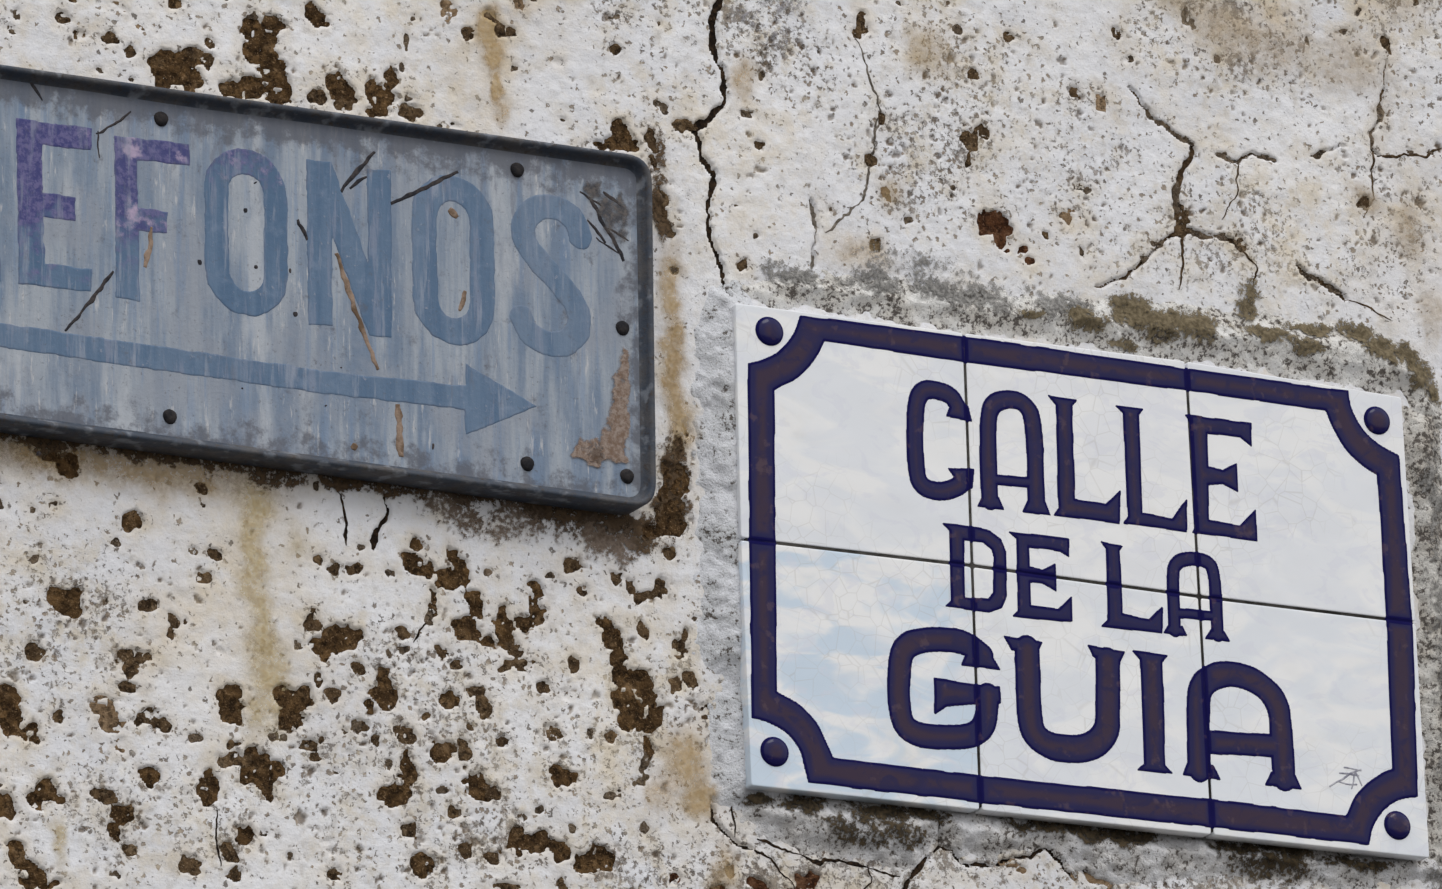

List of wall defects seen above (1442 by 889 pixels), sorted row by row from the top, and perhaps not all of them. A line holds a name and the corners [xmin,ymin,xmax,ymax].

spalling [55,0,424,122]
crack [691,0,730,295]
crack [1130,89,1195,197]
crack [1363,63,1441,218]
crack [1094,153,1274,289]
crack [1296,265,1391,320]
spalling [0,683,64,744]
spalling [89,649,172,753]
spalling [196,538,587,819]
spalling [587,572,708,800]
spalling [6,840,60,889]
spalling [458,805,615,889]